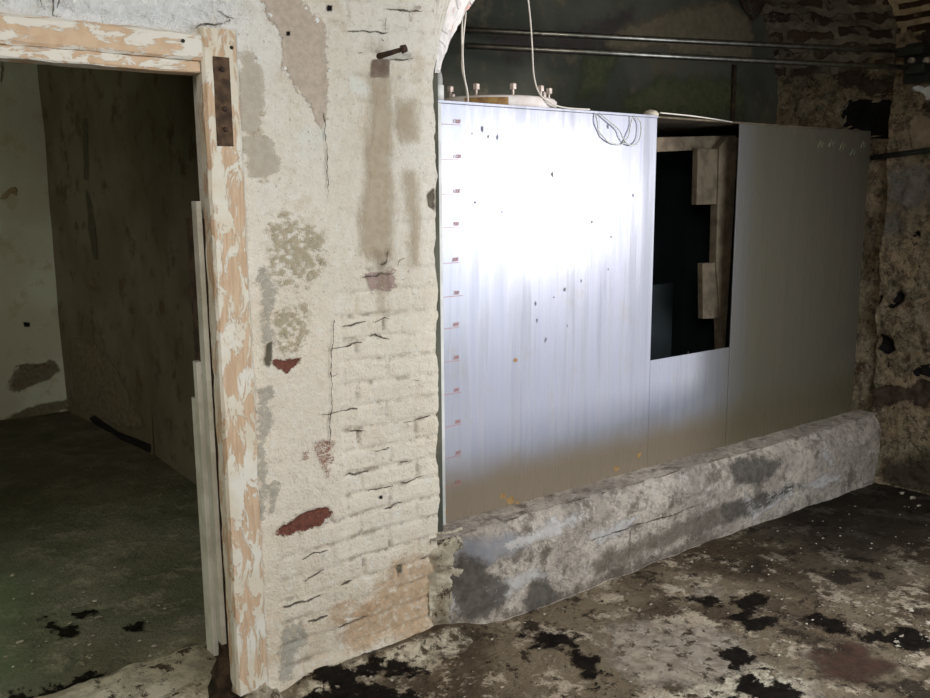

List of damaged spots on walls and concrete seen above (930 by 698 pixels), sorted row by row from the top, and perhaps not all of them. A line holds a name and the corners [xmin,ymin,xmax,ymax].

crack [196,11,233,28]
peeling [260,0,332,128]
spalling [833,70,894,139]
peeling [265,303,310,374]
crack [322,317,388,445]
crack [345,447,423,509]
spalling [276,507,333,538]
water stain [685,590,787,631]
water stain [302,651,430,698]
water stain [518,629,614,698]
water stain [717,645,805,698]
water stain [796,612,930,682]